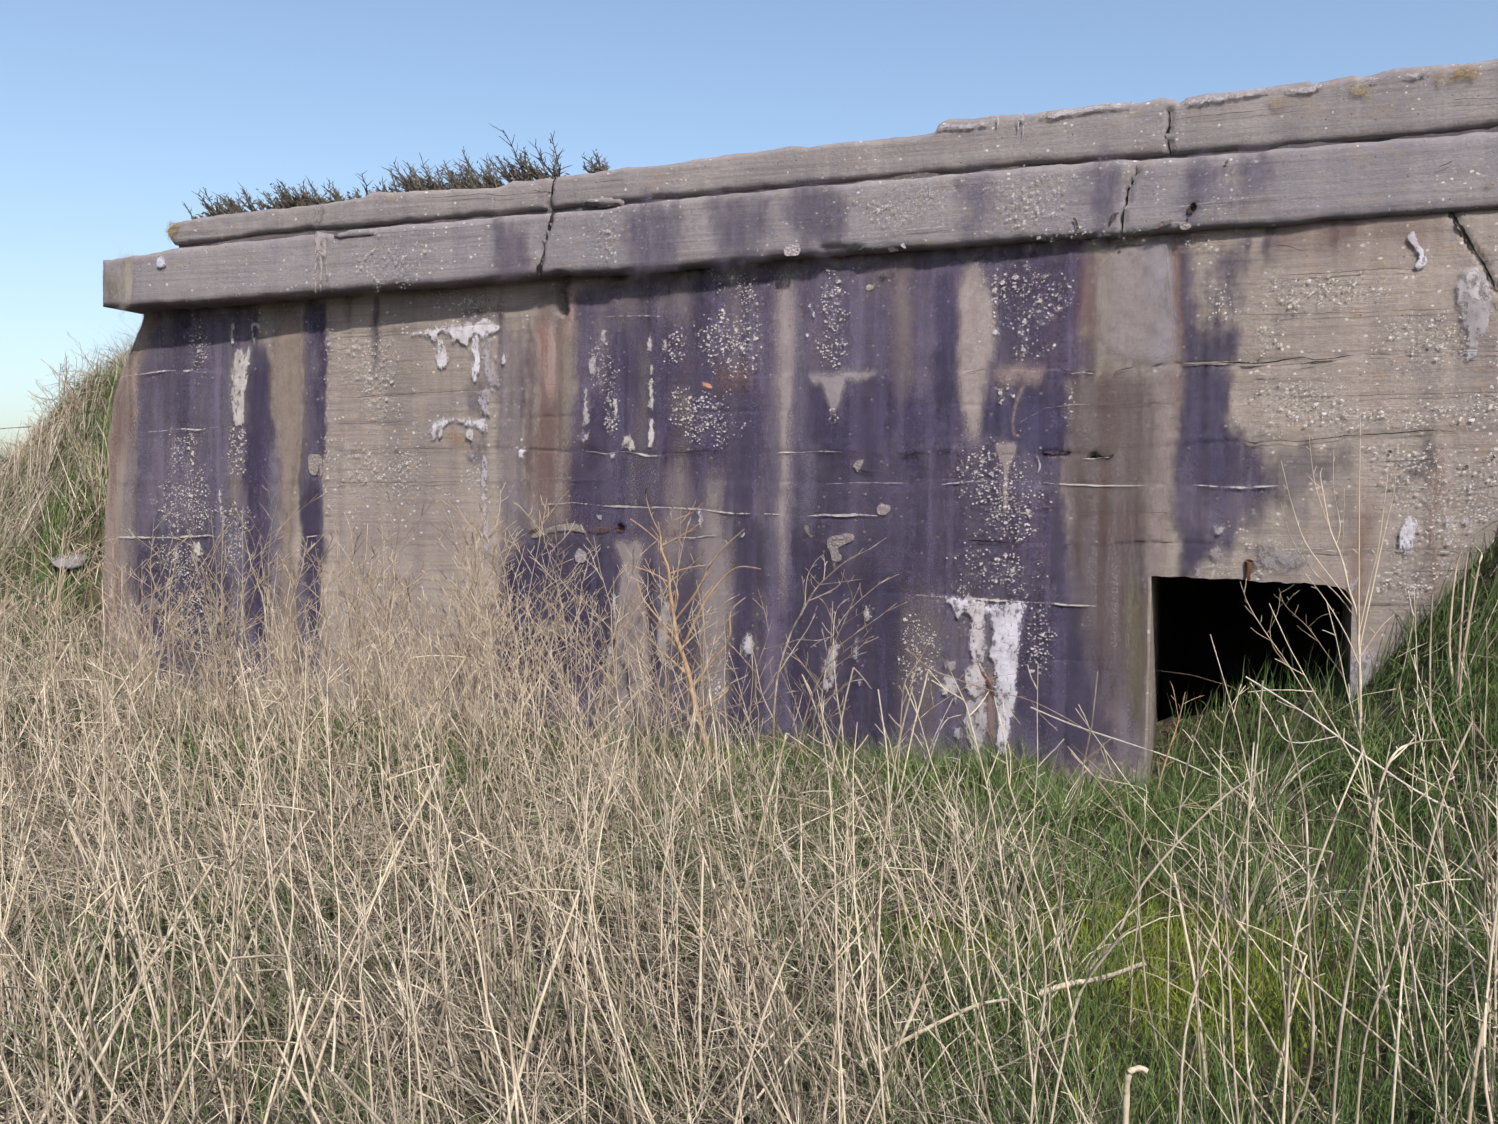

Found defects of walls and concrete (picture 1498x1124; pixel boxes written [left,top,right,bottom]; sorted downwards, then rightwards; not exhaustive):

crack [1165,104,1311,154]
crack [425,179,555,276]
crack [1122,169,1138,233]
crack [1277,244,1414,275]
crack [1452,207,1498,292]
crack [1239,307,1452,315]
water stain [127,203,328,687]
water stain [411,171,1324,772]
crack [1061,351,1498,462]